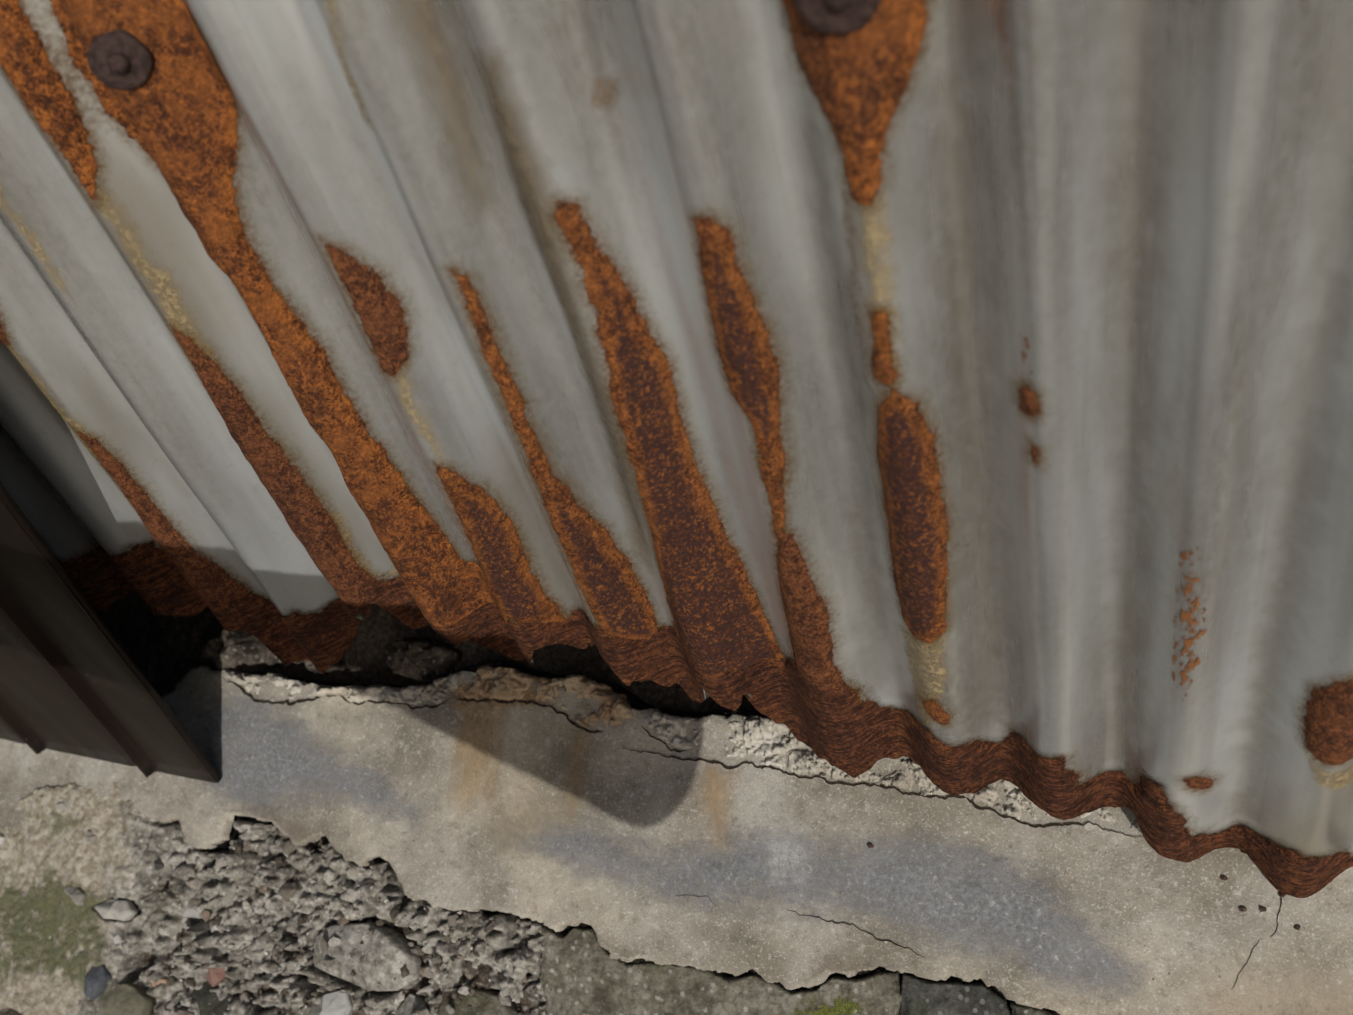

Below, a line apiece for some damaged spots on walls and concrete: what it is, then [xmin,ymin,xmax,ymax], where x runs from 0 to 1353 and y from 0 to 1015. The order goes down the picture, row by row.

rust [0,0,120,224]
rust [49,0,509,627]
spalling [0,782,902,1015]
rust [490,87,640,528]
rust [0,198,1353,898]
crack [223,678,1144,837]
rust [782,0,953,726]